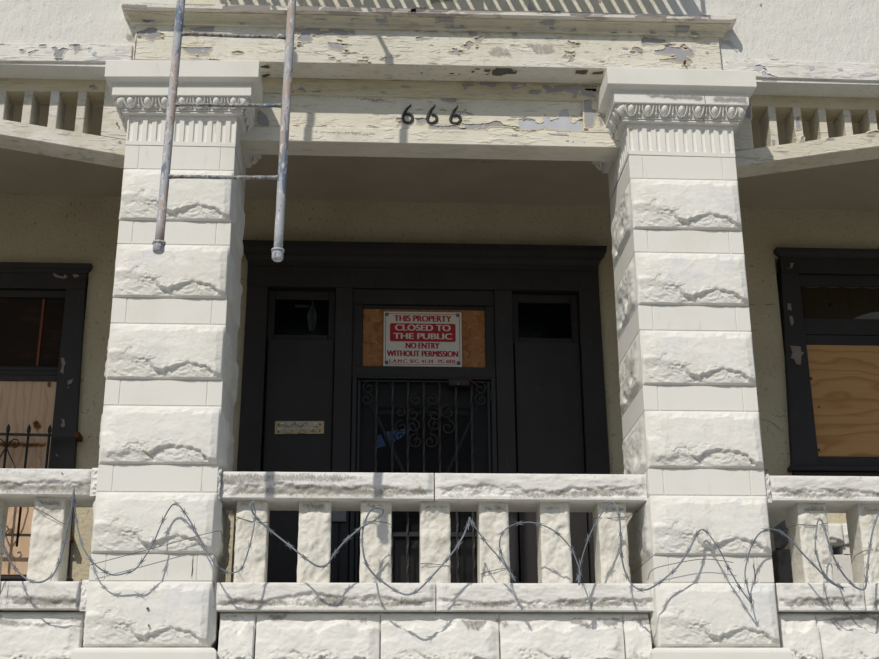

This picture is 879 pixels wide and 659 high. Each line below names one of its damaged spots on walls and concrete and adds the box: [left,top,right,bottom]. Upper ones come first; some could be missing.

peeling [18,43,98,61]
peeling [285,5,387,64]
peeling [408,7,484,54]
peeling [529,4,592,31]
peeling [609,17,711,66]
peeling [415,28,605,143]
peeling [255,110,271,128]